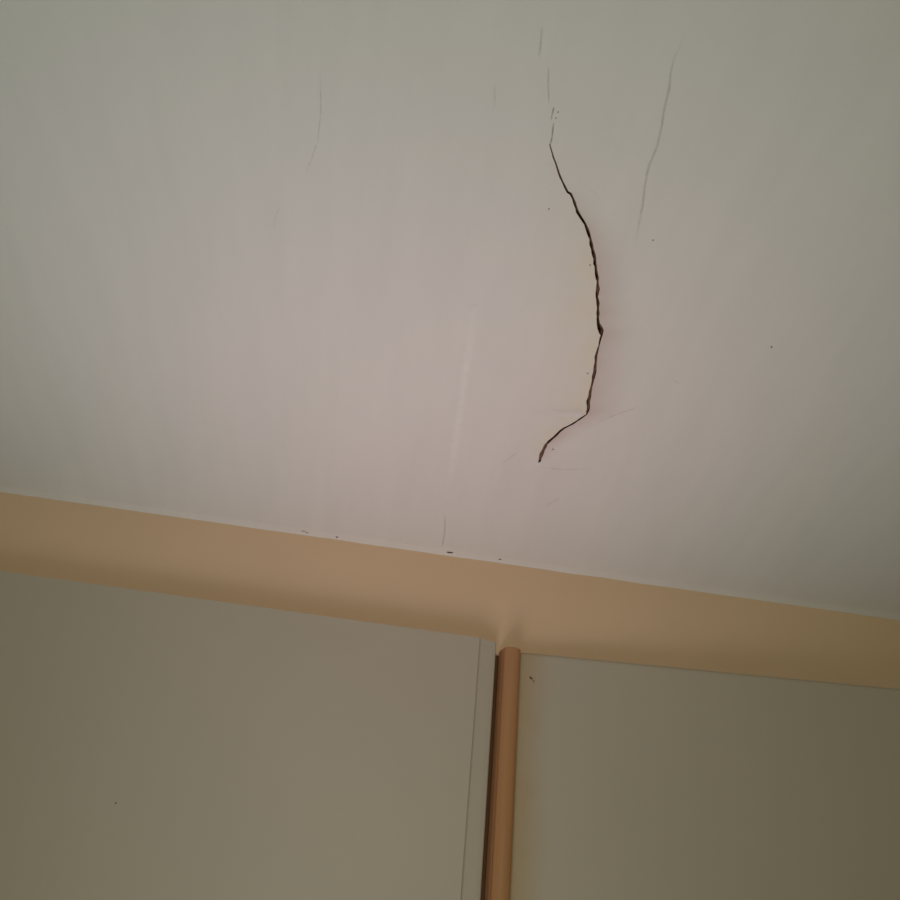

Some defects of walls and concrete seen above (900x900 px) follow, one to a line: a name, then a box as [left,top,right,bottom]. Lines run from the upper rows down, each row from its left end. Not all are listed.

crack [538,144,604,463]